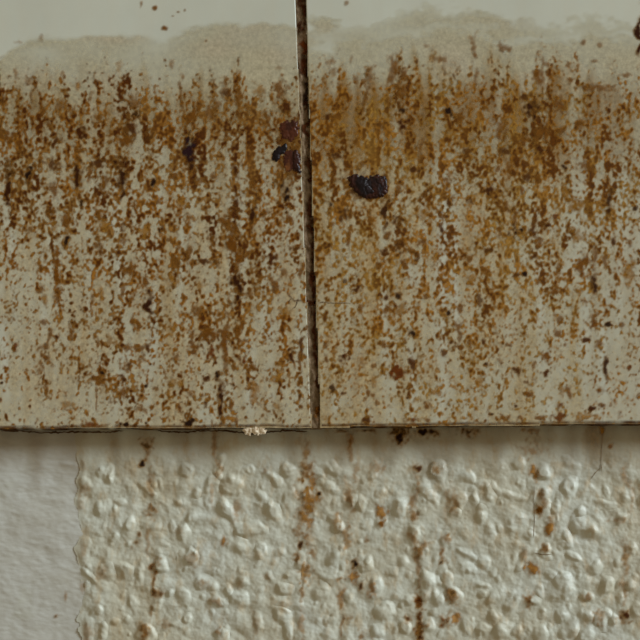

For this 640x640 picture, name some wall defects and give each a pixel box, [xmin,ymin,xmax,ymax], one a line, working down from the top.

rust [296,0,307,34]
leakage [0,56,140,148]
leakage [173,25,300,142]
leakage [307,61,338,139]
leakage [379,101,416,152]
leakage [383,17,640,148]
rust [0,41,640,455]
rust [300,463,321,527]
rust [295,541,310,597]
rust [349,559,362,590]